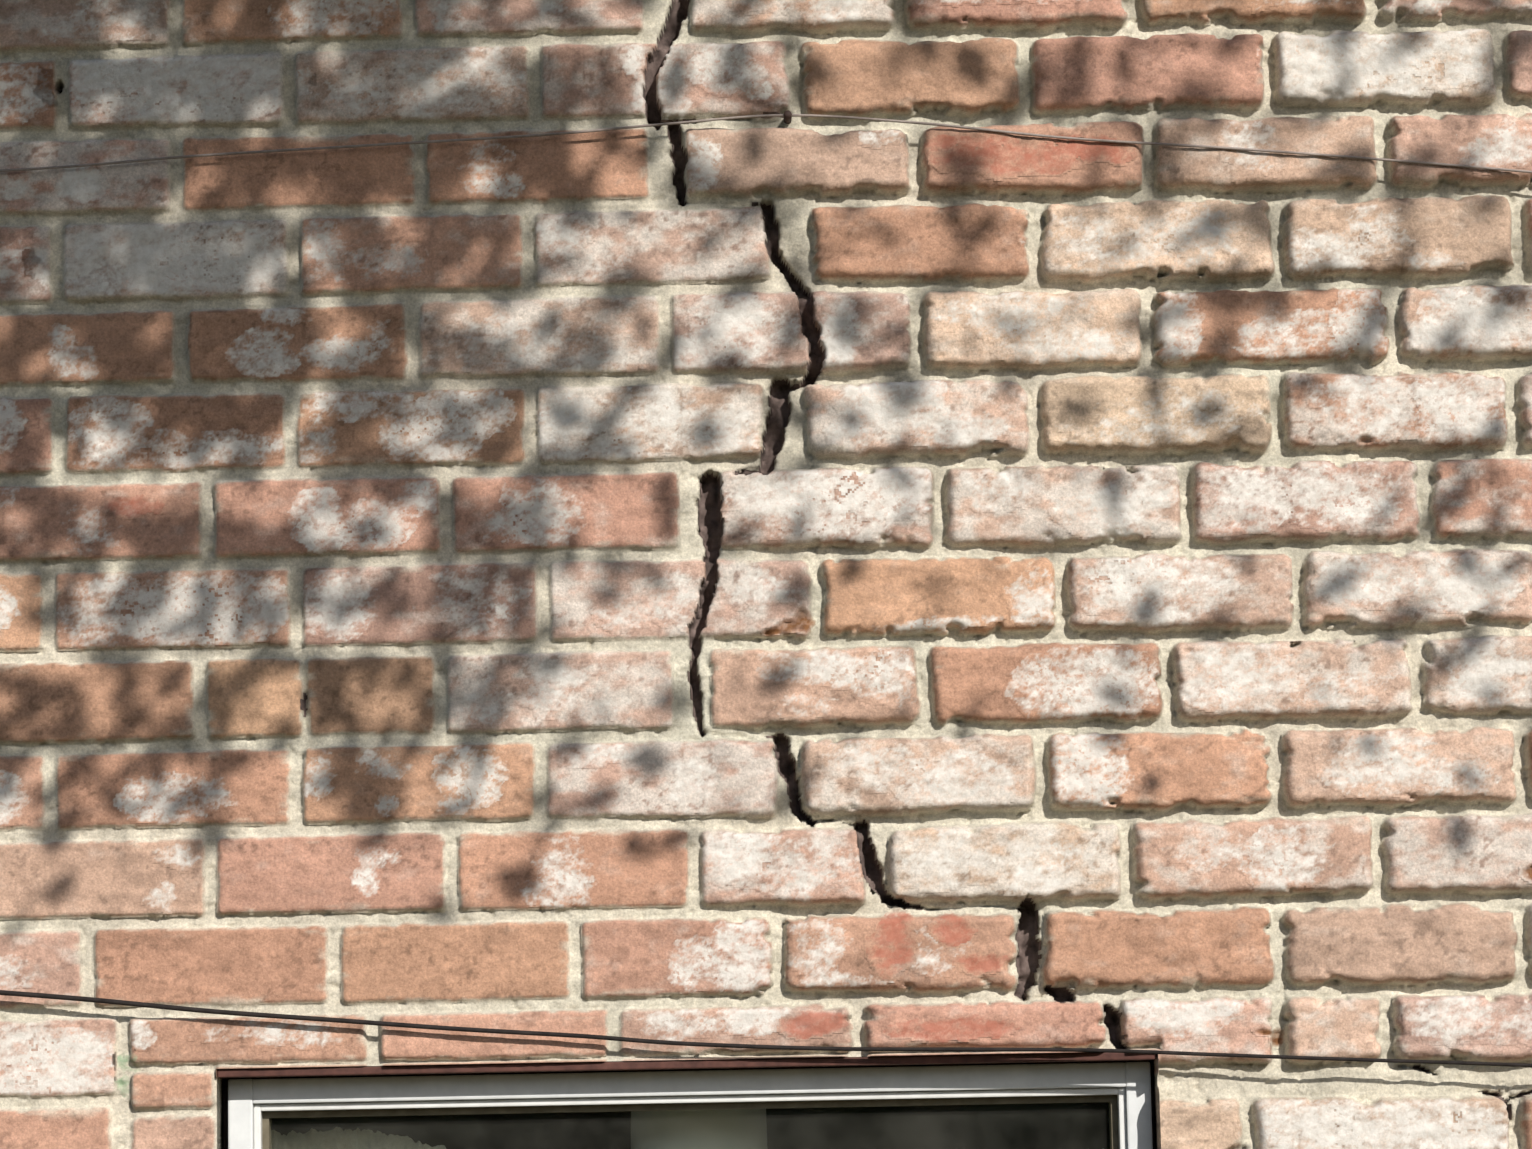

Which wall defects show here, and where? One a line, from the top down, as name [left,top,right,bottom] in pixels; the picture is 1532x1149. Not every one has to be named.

crack [643,0,696,206]
crack [688,202,825,737]
crack [766,733,817,826]
crack [854,820,923,910]
crack [1014,898,1127,1049]